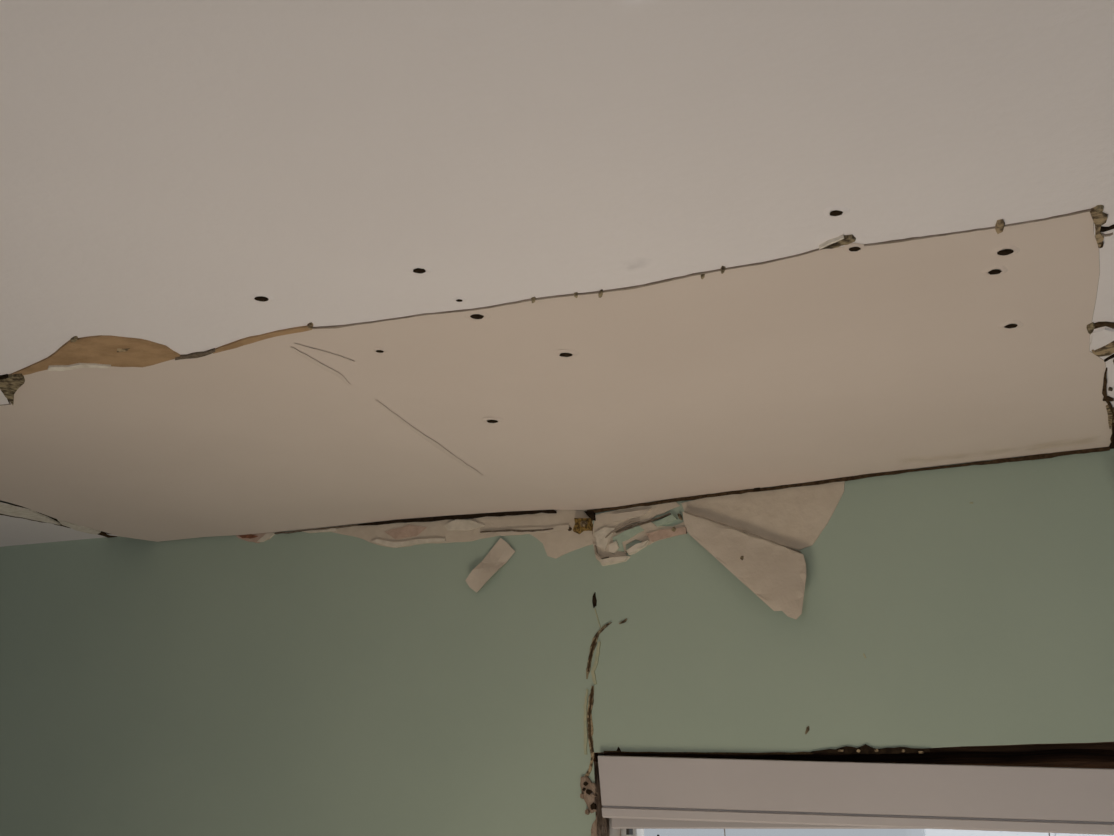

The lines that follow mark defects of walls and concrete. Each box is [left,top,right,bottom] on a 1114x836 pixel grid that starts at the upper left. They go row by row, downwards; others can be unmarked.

spalling [819,234,856,250]
peeling [995,219,1005,234]
spalling [1090,205,1114,248]
spalling [1086,322,1114,363]
crack [1102,354,1114,449]
crack [0,502,118,538]
peeling [236,532,275,543]
peeling [292,481,845,592]
crack [583,593,813,777]